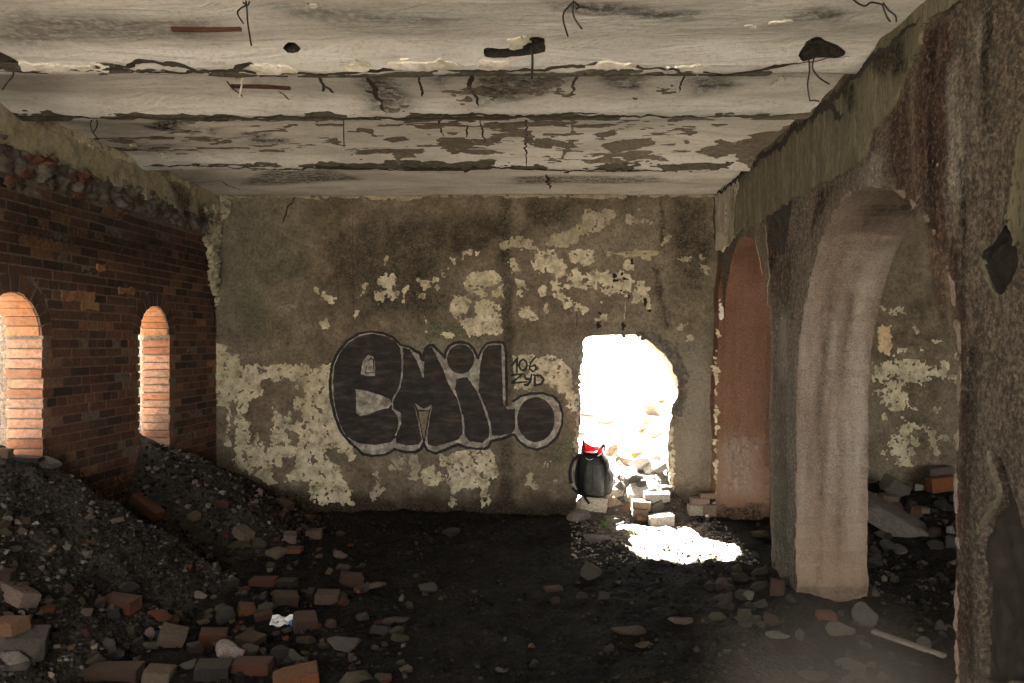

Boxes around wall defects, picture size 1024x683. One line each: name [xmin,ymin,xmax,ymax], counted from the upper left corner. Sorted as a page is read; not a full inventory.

flaking render [0,0,966,339]
flaking render [977,117,1024,300]
peeling [216,343,356,506]
peeling [872,306,962,467]